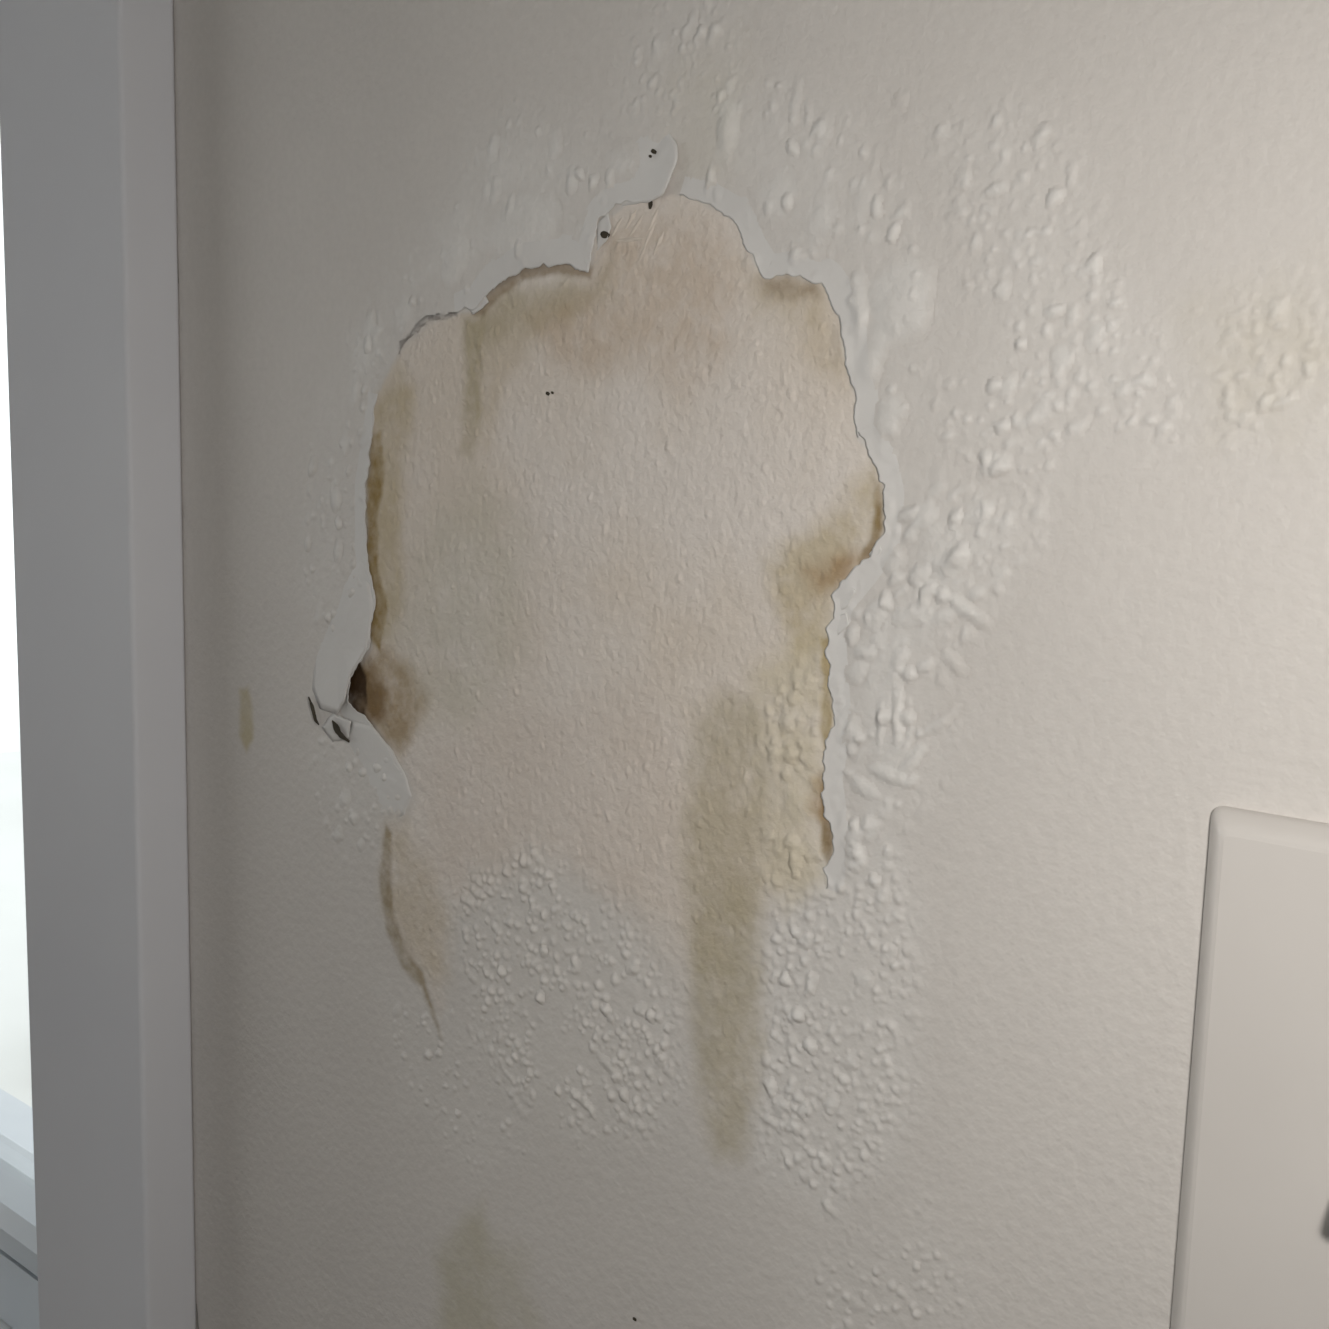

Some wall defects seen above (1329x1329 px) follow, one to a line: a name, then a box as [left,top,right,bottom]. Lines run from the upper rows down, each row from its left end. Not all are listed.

peeling [312,392,412,817]
damp [345,5,886,1173]
peeling [398,134,904,894]